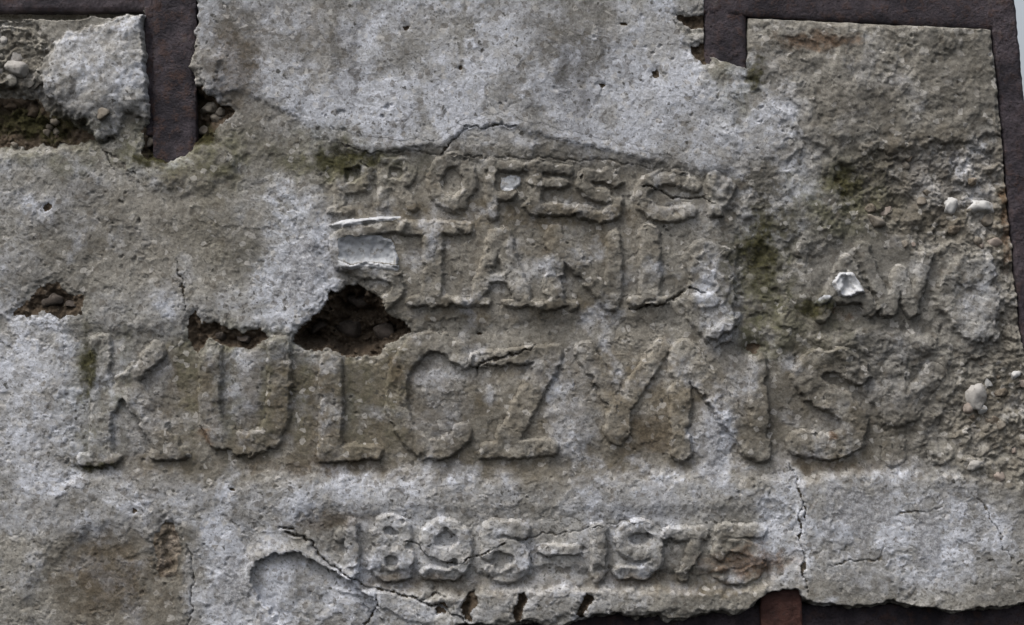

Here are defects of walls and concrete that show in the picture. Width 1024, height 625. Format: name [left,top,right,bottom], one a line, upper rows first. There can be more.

spalling [0,23,95,150]
spalling [13,282,84,319]
crack [283,527,463,625]
crack [789,466,885,587]